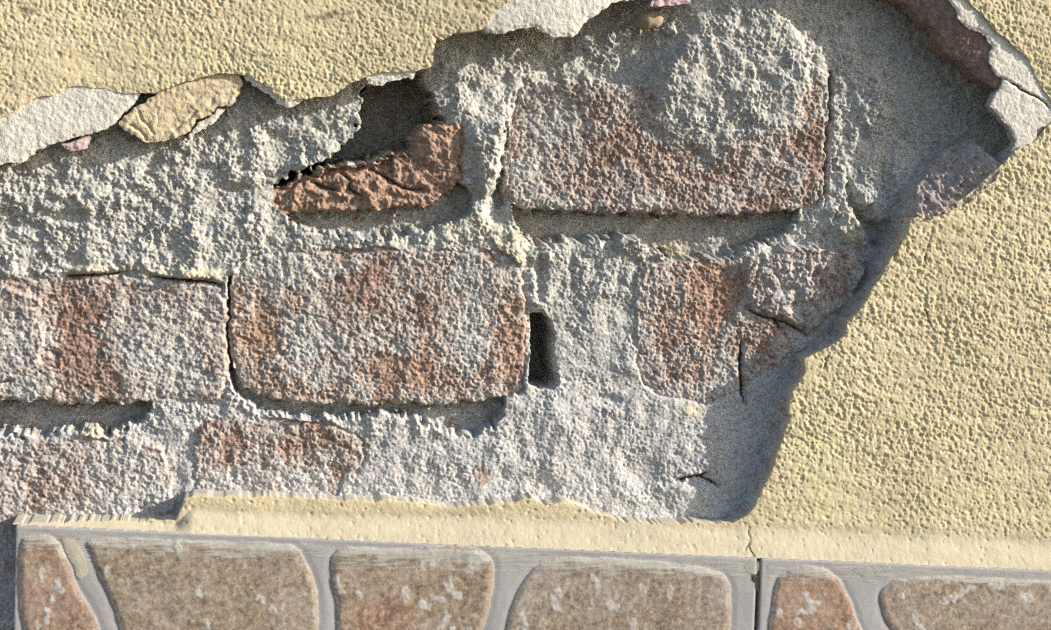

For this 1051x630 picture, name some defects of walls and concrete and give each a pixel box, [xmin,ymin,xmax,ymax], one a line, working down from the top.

flaking render [0,73,303,166]
spalling [274,70,447,187]
flaking render [482,0,632,38]
flaking render [645,0,691,8]
flaking render [884,0,1051,152]
flaking render [814,135,1001,350]
spalling [528,312,560,390]
flaking render [732,395,796,517]